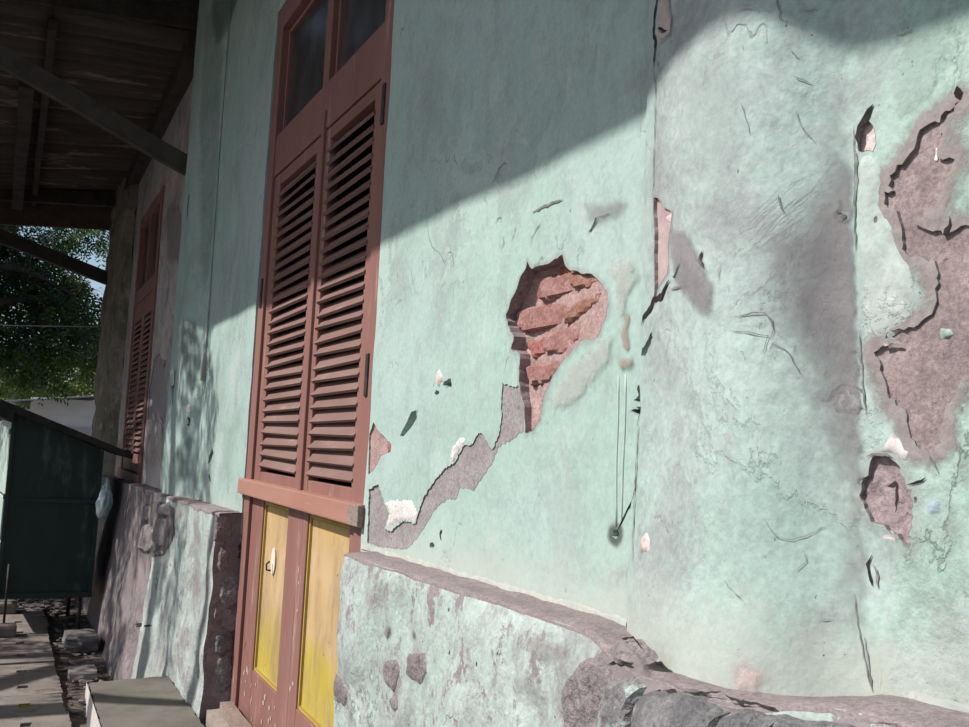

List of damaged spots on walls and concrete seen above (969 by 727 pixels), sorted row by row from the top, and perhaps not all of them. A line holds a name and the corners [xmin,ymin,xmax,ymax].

leakage [656,0,671,41]
flaking render [653,197,680,297]
leakage [669,231,711,312]
flaking render [854,84,969,548]
flaking render [361,255,856,727]
flaking render [866,555,879,588]